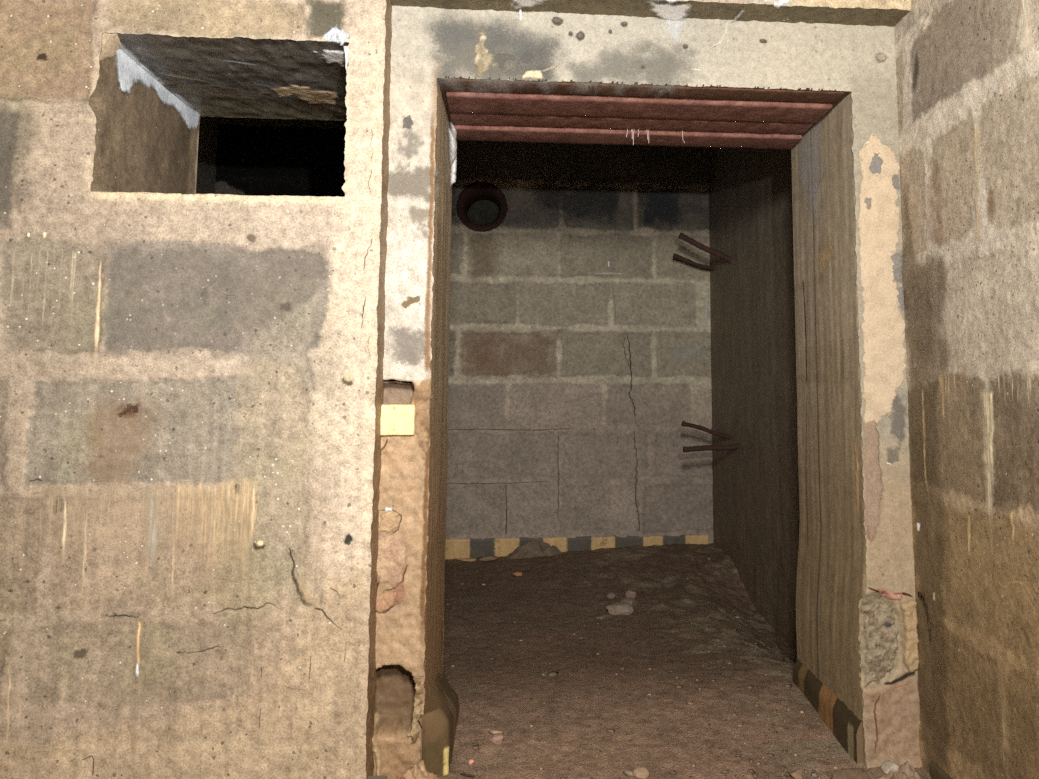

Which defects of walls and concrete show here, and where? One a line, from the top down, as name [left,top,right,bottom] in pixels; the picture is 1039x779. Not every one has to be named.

leakage [513,0,542,21]
leakage [652,0,690,27]
crack [624,336,635,414]
peeling [858,134,907,540]
crack [289,548,339,628]
spalling [863,596,899,686]
peeling [372,714,381,776]
spalling [406,671,424,743]